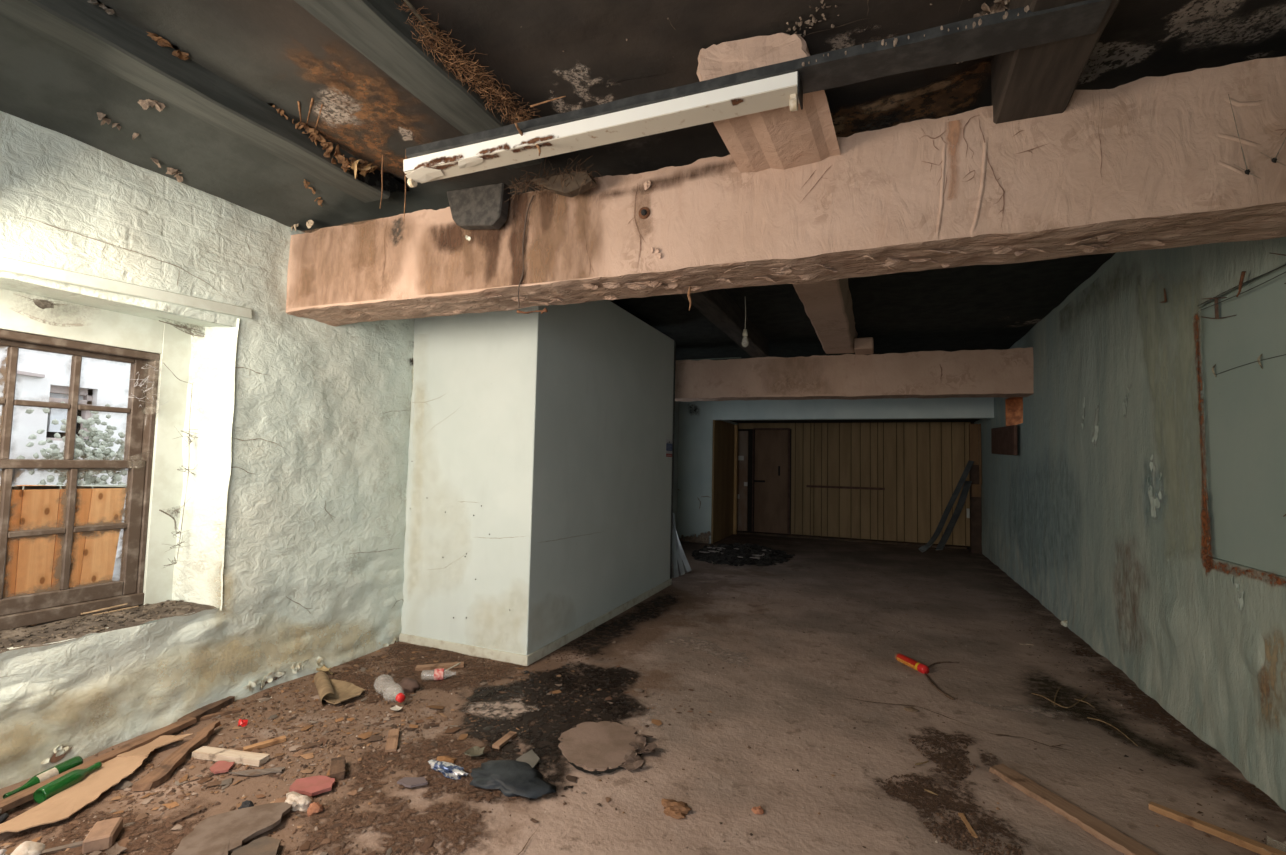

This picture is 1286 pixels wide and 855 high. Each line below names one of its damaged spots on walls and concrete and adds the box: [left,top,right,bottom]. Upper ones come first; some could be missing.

peeling [147,32,190,60]
peeling [97,112,139,140]
peeling [138,99,165,112]
peeling [267,103,407,185]
damp [297,222,405,303]
damp [421,190,598,295]